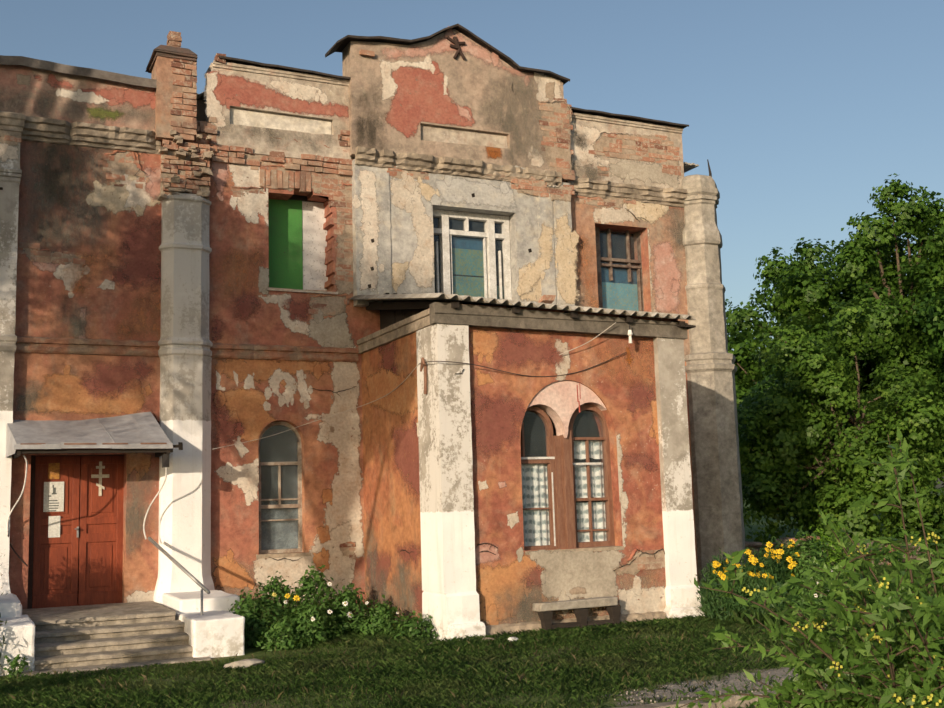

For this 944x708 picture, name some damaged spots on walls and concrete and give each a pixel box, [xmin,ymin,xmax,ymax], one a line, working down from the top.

damp [24,142,111,248]
peeling [86,150,161,217]
peeling [195,26,682,348]
spalling [17,242,90,298]
peeling [470,330,499,412]
peeling [551,339,571,381]
peeling [213,359,421,613]
peeling [475,434,666,625]